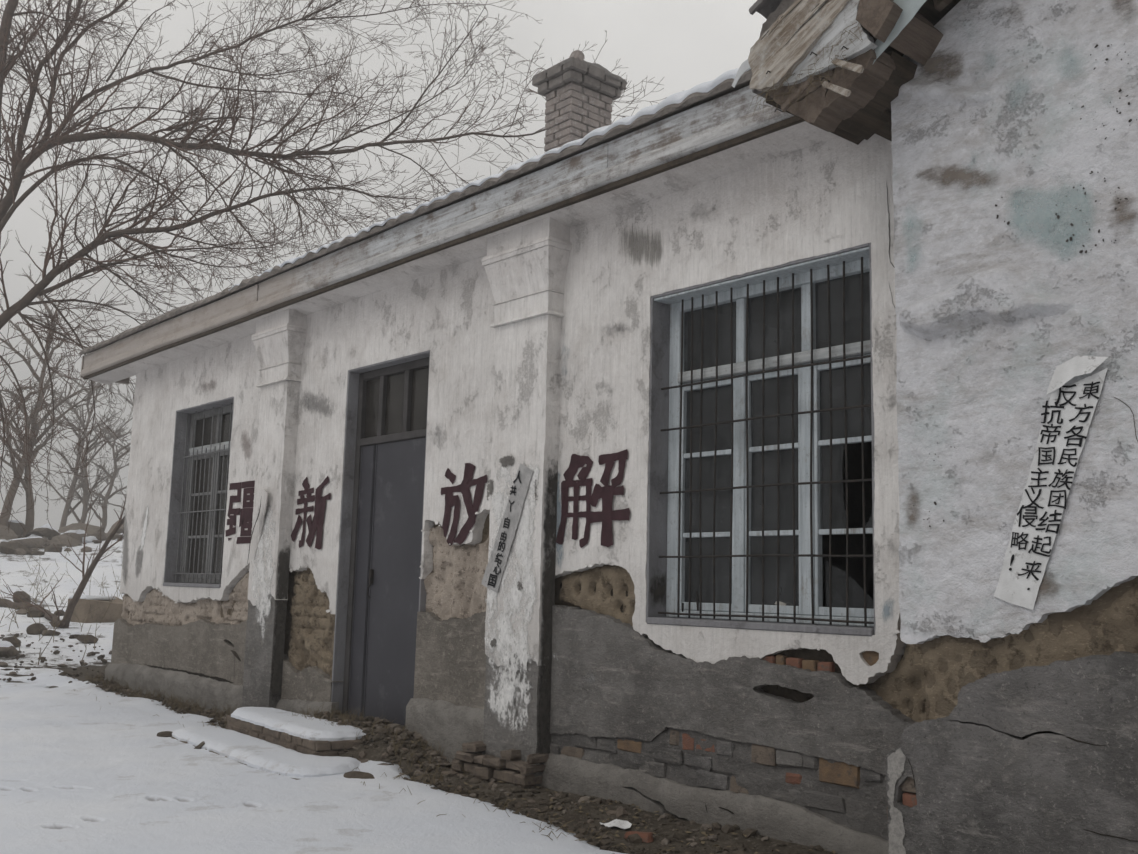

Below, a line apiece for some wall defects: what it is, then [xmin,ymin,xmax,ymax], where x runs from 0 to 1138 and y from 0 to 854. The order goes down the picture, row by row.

leakage [920,166,990,188]
crack [886,183,895,307]
spalling [121,489,275,637]
spalling [288,566,335,679]
peeling [420,456,539,729]
spalling [556,473,635,626]
spalling [761,685,814,702]
spalling [762,648,842,673]
spalling [854,583,1138,722]
crack [1020,731,1105,746]